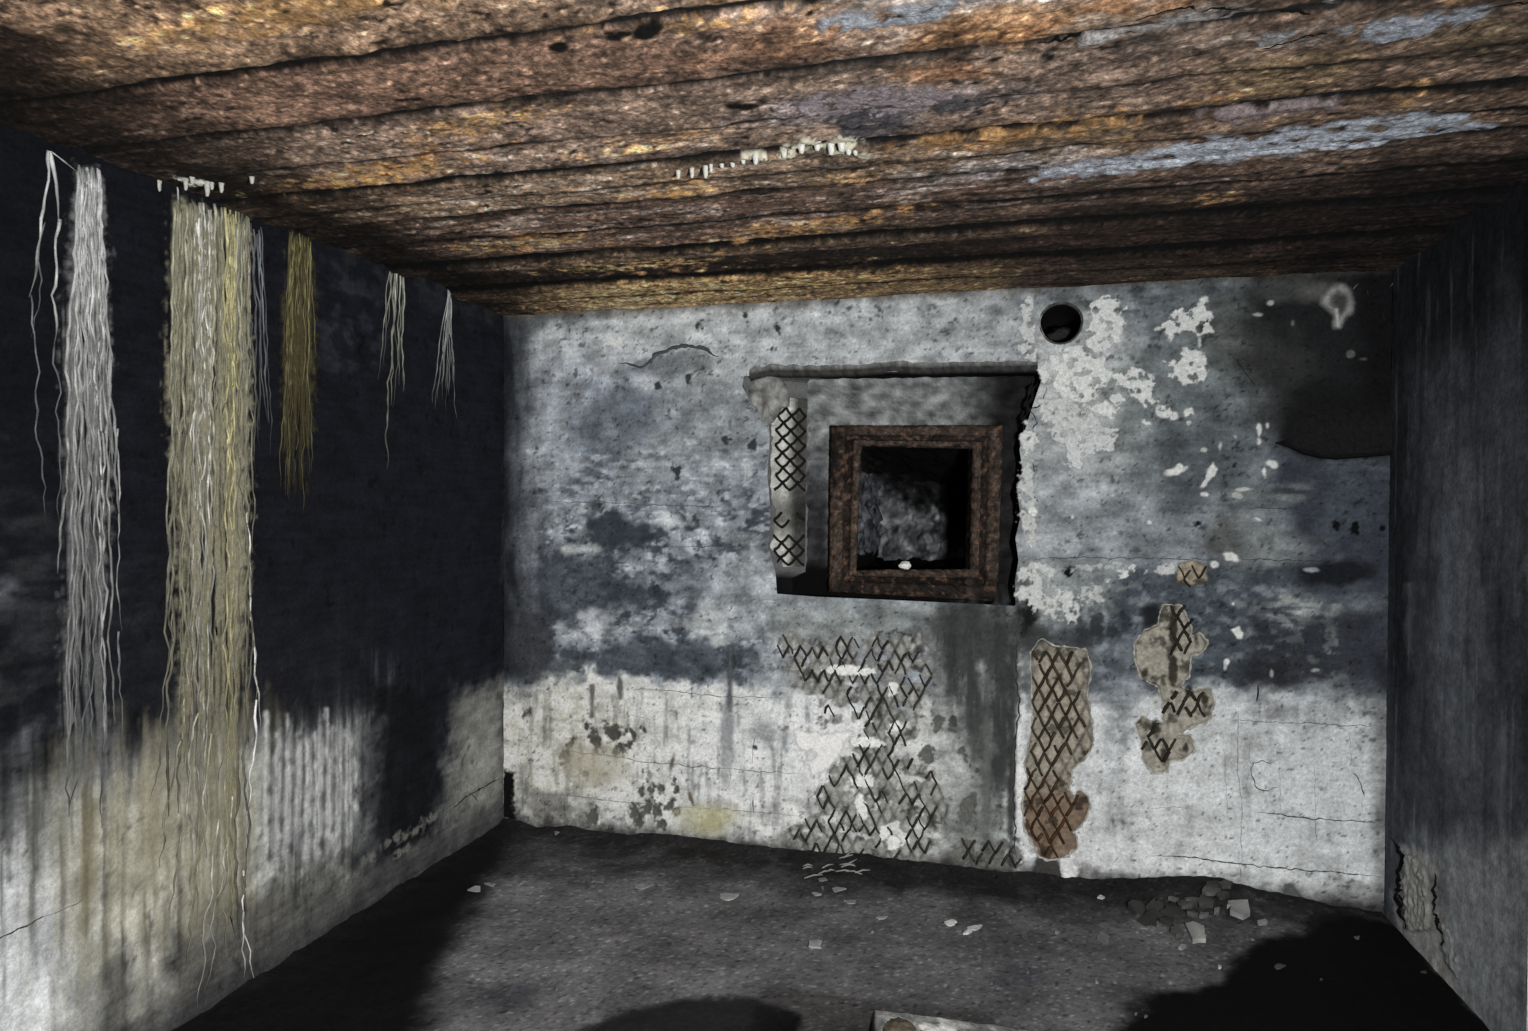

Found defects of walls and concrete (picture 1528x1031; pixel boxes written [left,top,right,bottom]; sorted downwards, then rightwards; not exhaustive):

damp [29,150,123,819]
damp [149,187,505,1031]
flaking render [777,630,1094,878]
peeling [1014,295,1239,624]
flaking render [1133,604,1216,775]
peeling [1231,487,1251,499]
peeling [1256,423,1278,476]
flaking render [1332,521,1359,535]